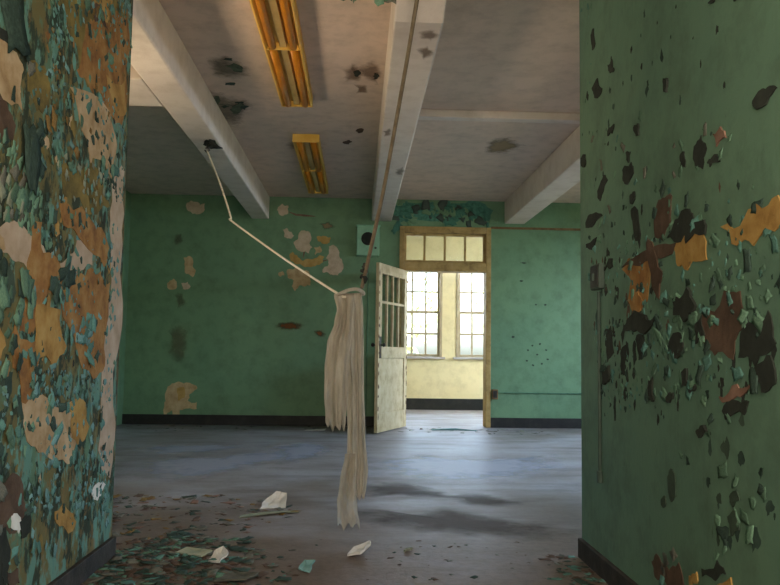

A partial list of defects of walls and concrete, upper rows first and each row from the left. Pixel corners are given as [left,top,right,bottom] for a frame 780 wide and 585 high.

leakage [214,58,243,85]
leakage [214,96,249,121]
leakage [348,67,379,92]
peeling [585,78,611,103]
peeling [752,85,778,110]
peeling [391,199,499,235]
flaking render [167,256,196,290]
flaking render [278,228,343,291]
flaking render [163,382,197,414]